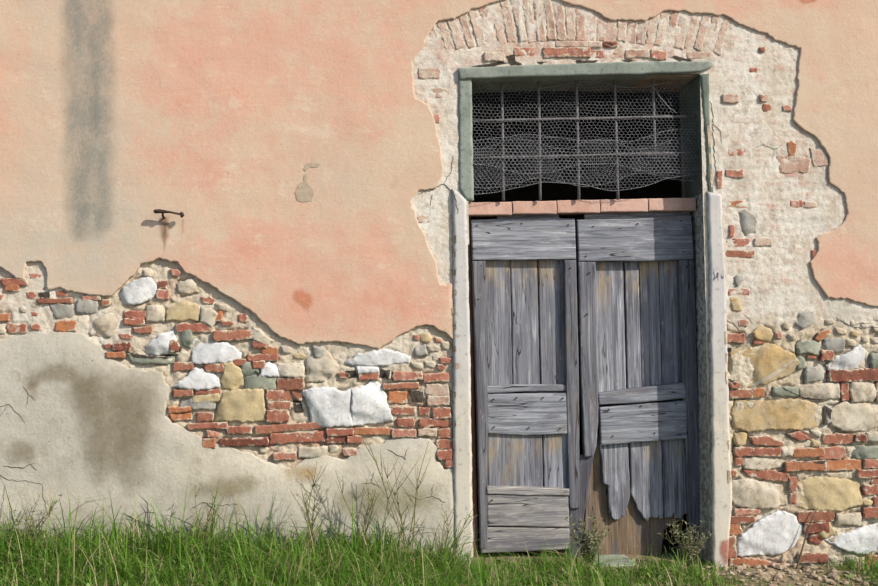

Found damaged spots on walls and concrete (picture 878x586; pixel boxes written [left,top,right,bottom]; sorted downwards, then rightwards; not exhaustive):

leakage [67,0,110,227]
spalling [0,258,459,469]
peeling [295,163,320,202]
spalling [411,0,878,567]
crack [0,463,47,518]